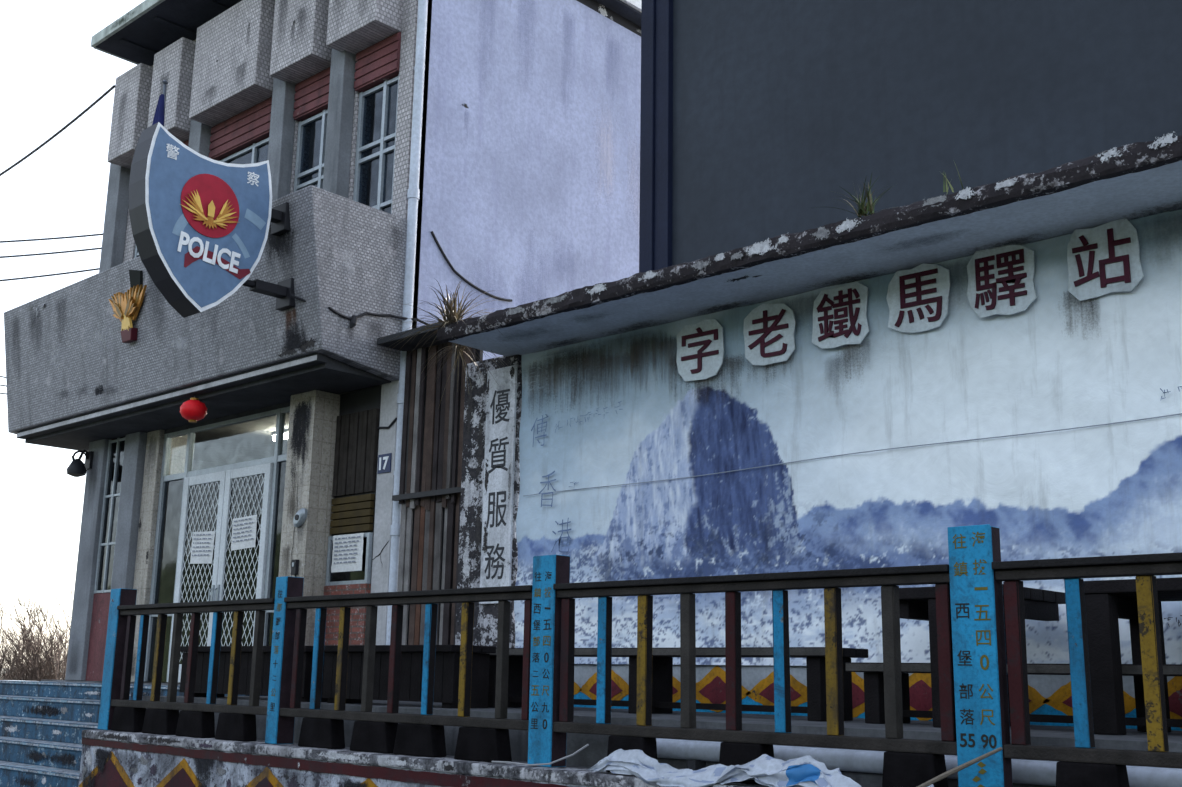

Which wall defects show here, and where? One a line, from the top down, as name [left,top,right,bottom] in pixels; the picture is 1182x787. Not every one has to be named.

damp [266,225,294,259]
damp [843,344,860,373]
damp [290,401,310,518]
peeling [462,373,489,583]
peeling [74,734,129,787]
peeling [131,755,157,785]
peeling [284,763,300,787]
peeling [319,751,365,761]
peeling [384,759,417,767]